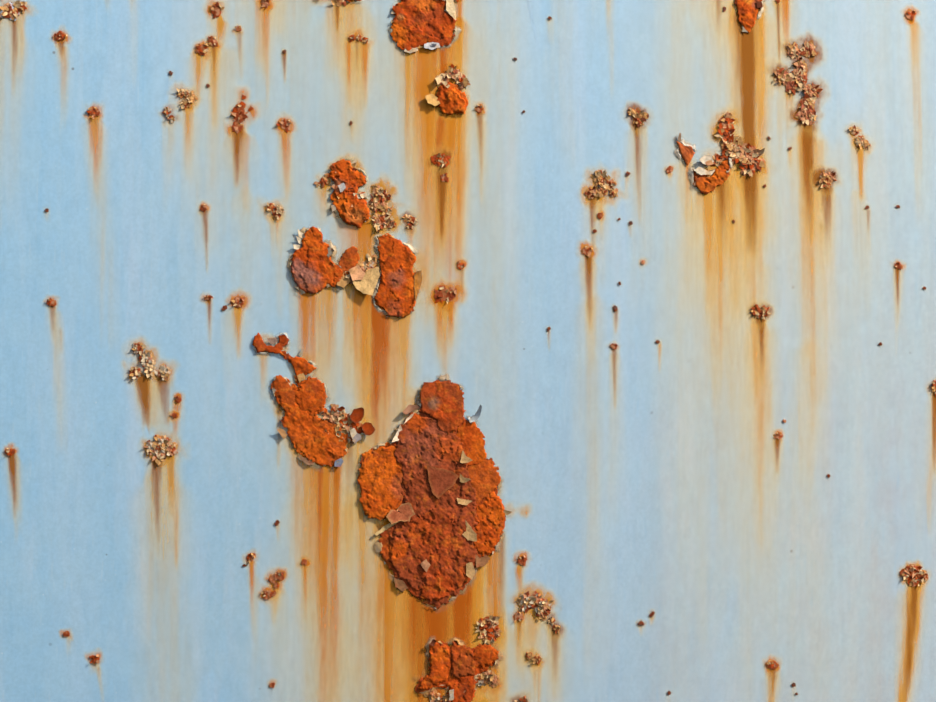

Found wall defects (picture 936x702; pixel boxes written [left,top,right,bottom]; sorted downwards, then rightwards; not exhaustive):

corrosion [331,0,361,28]
corrosion [390,0,485,231]
corrosion [666,0,837,281]
corrosion [582,170,618,233]
corrosion [581,243,595,298]
corrosion [129,342,181,419]
corrosion [252,157,563,702]
corrosion [144,435,178,509]
corrosion [242,553,256,586]
corrosion [899,563,928,702]